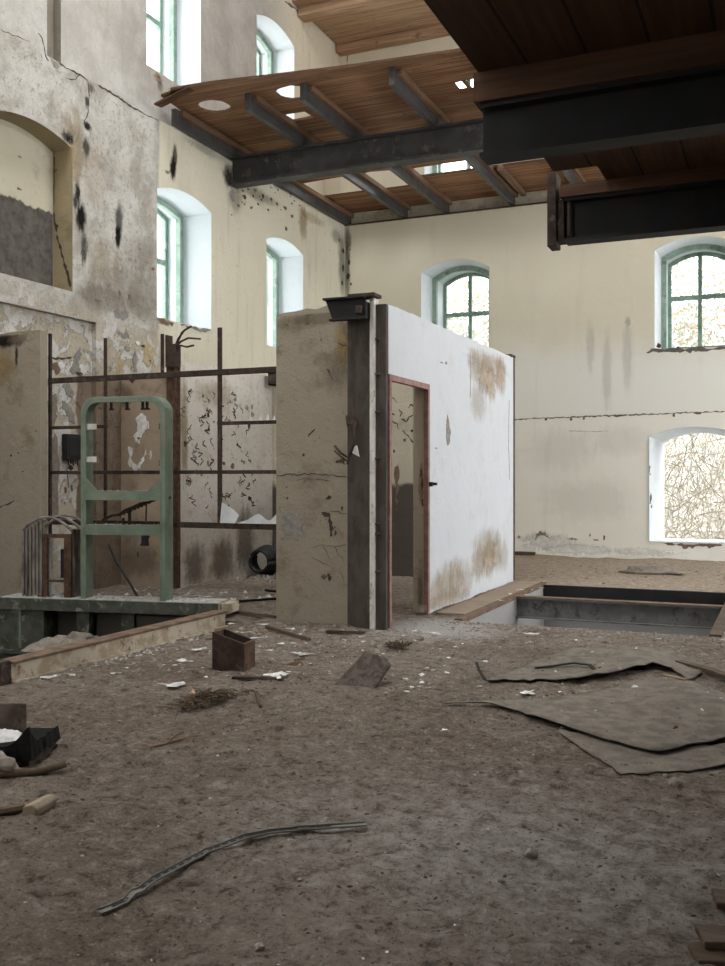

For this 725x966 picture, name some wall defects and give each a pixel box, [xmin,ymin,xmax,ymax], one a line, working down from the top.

crack [2,30,158,123]
crack [53,157,71,287]
spalling [226,170,302,231]
peeling [114,291,155,384]
spalling [646,343,725,353]
peeling [128,413,152,471]
peeling [180,389,256,509]
crack [278,473,346,483]
crack [508,411,725,441]